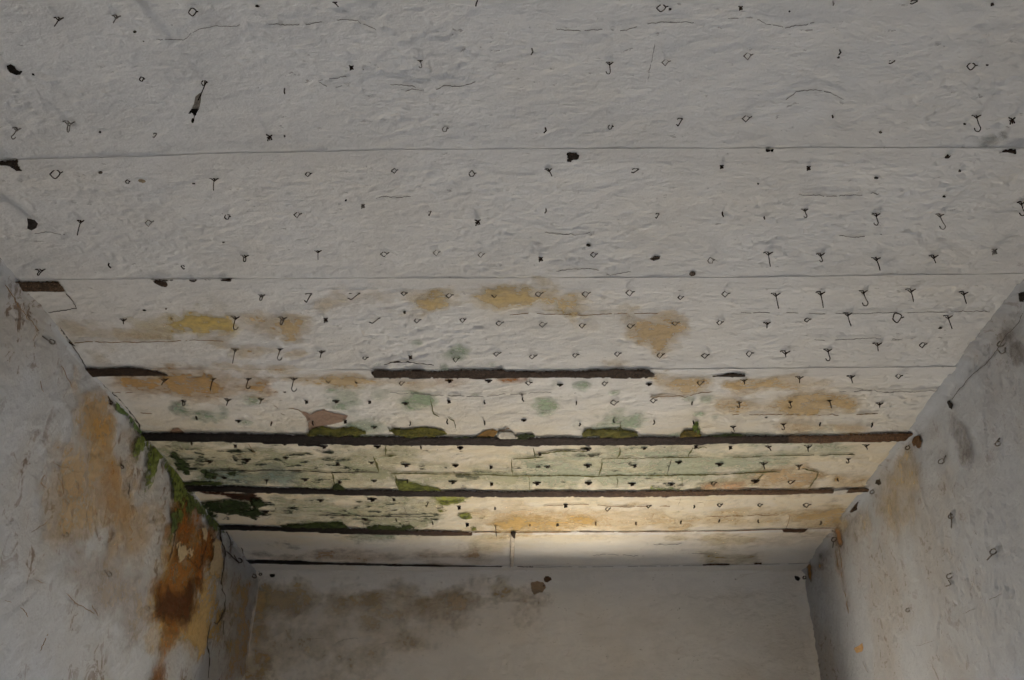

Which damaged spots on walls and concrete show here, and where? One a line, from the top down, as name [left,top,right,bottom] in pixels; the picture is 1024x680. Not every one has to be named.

damp [474,286,577,316]
damp [168,312,233,333]
damp [120,367,224,397]
damp [724,378,855,416]
peeling [302,409,348,431]
damp [165,442,444,525]
damp [445,451,543,489]